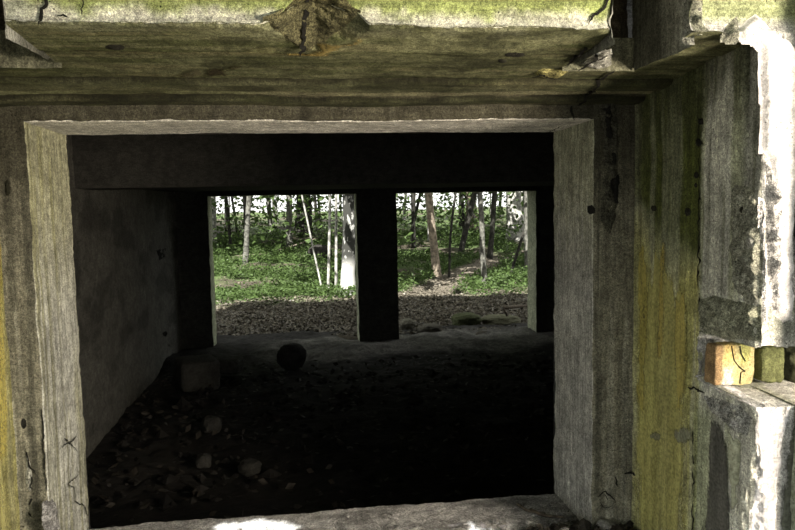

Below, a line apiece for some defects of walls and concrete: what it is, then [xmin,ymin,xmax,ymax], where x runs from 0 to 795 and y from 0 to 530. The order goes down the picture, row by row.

crack [38,0,84,25]
spalling [263,0,361,56]
crack [588,0,609,24]
spalling [720,17,740,45]
spalling [532,49,612,80]
crack [567,47,588,66]
spalling [698,184,763,343]
leakage [0,245,8,458]